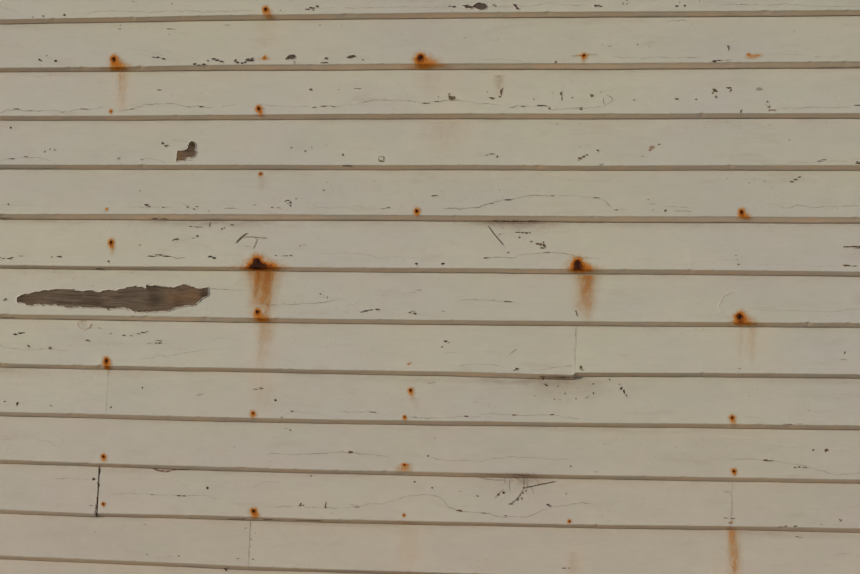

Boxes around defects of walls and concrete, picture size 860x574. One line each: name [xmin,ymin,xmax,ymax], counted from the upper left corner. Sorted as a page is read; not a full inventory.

rust [110,55,127,71]
rust [414,53,442,69]
peeling [161,140,197,162]
rust [568,257,594,293]
peeling [3,283,210,314]
rust [242,255,281,322]
rust [733,311,754,326]